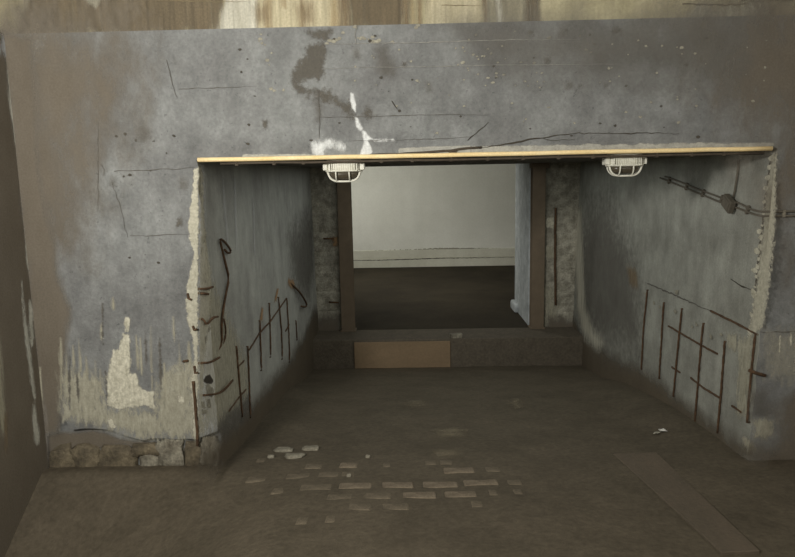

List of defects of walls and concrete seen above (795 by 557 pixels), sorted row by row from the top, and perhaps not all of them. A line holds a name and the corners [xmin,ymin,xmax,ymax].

peeling [57,168,298,446]
water stain [0,0,406,557]
crack [468,125,672,148]
spalling [471,135,778,450]